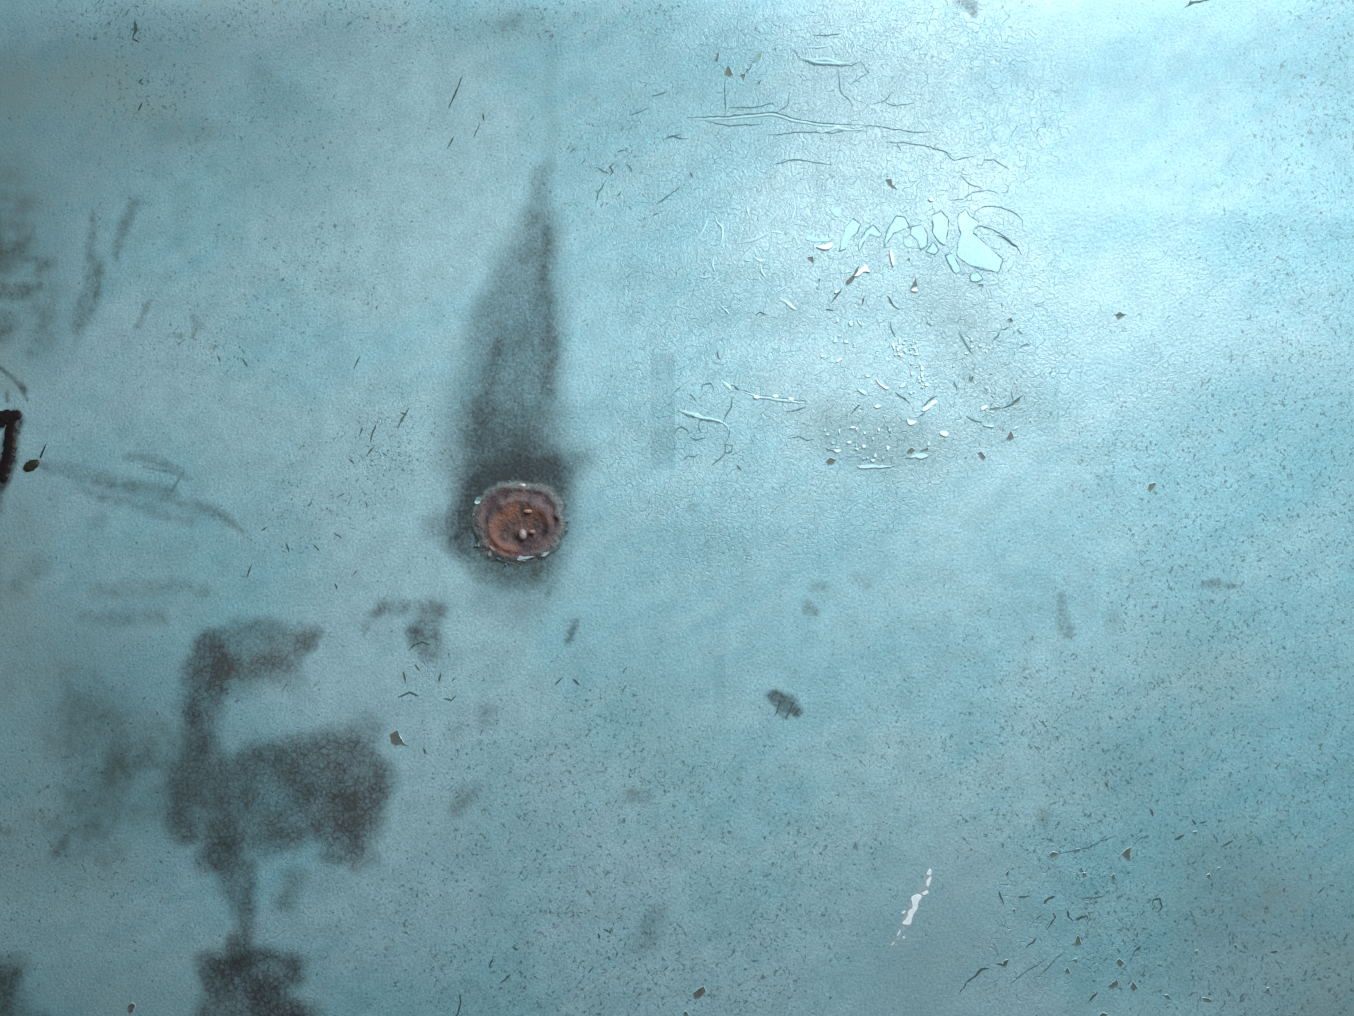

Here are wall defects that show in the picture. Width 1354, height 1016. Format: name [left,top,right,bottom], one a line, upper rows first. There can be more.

crack [570,91,667,214]
crack [663,34,1023,255]
peeling [692,198,1003,363]
damp [449,226,571,583]
crack [675,352,812,469]
peeling [824,297,949,469]
peeling [952,302,1029,428]
corrosion [469,480,569,567]
peeling [891,869,932,946]